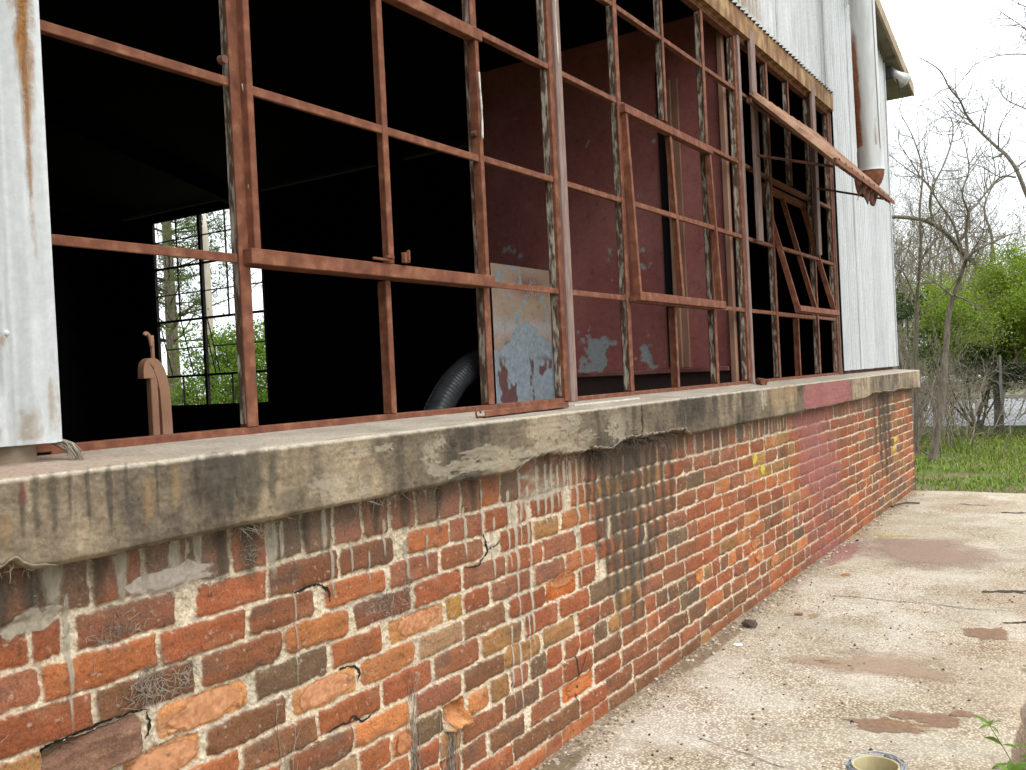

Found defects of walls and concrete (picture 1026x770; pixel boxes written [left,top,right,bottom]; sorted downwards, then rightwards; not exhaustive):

corrosion [16,0,32,170]
crack [463,534,500,569]
crack [294,583,331,601]
crack [339,665,361,682]
crack [38,709,151,757]
crack [329,705,379,733]
spalling [443,703,469,728]